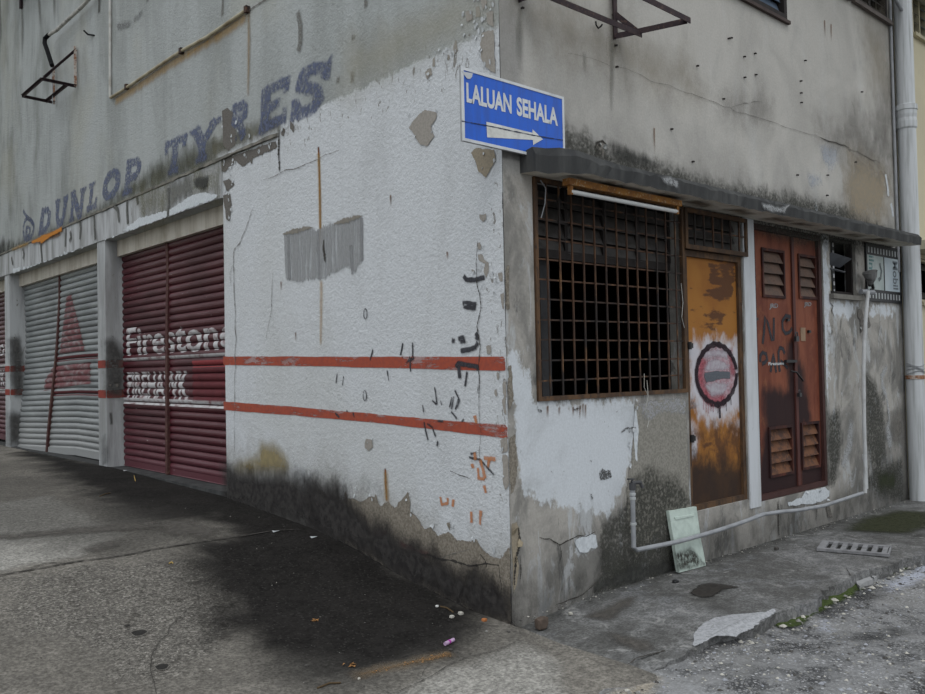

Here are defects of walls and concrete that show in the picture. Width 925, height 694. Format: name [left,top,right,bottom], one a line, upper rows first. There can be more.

damp [93,123,279,239]
peeling [408,108,437,146]
peeling [471,148,495,177]
damp [565,131,710,186]
damp [722,187,890,248]
peeling [622,398,691,558]
damp [828,410,853,485]
damp [866,368,903,501]
peeling [344,487,523,624]
crack [540,532,594,563]